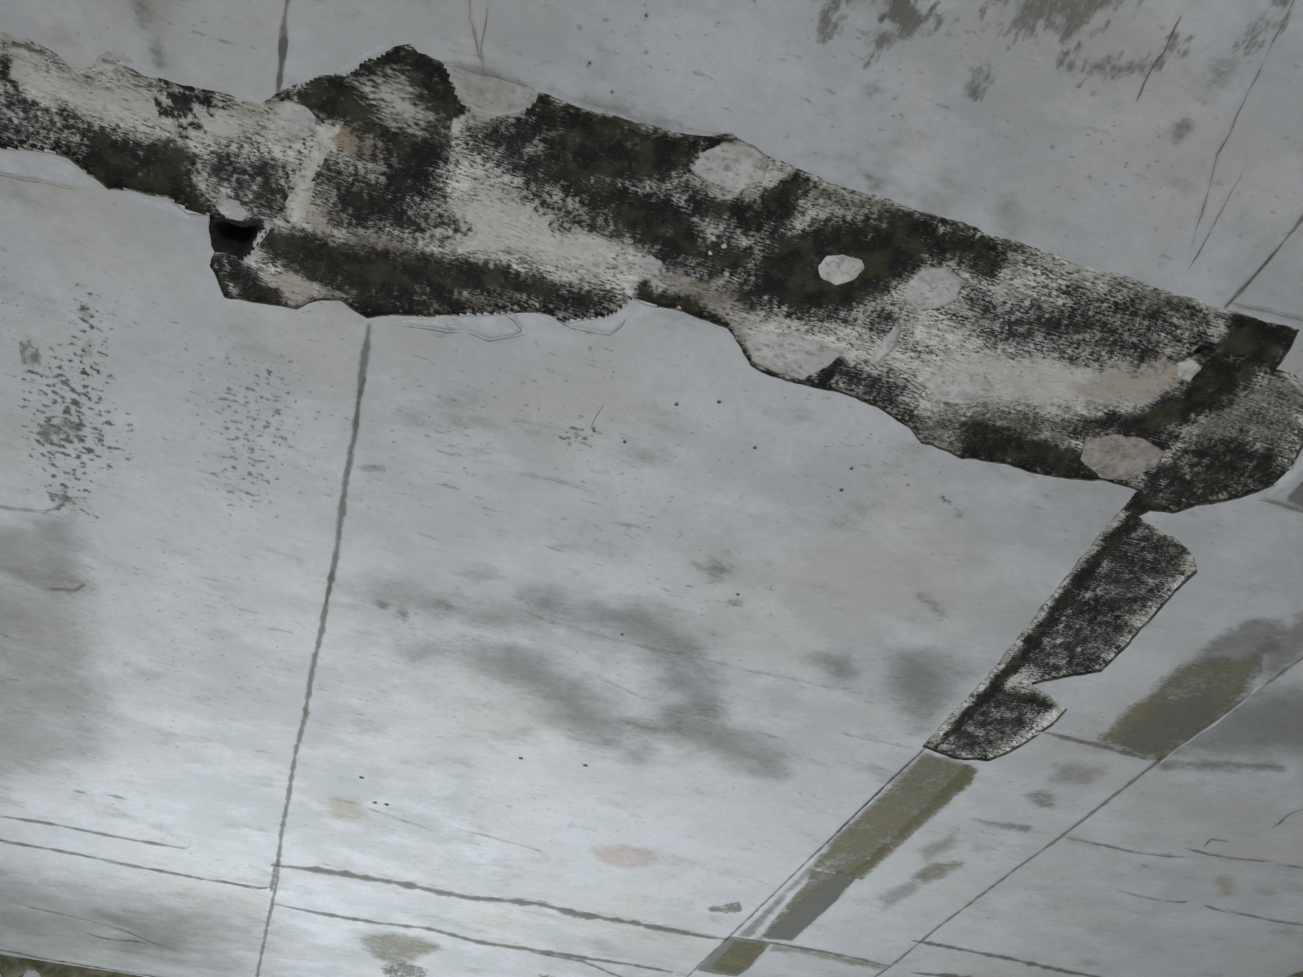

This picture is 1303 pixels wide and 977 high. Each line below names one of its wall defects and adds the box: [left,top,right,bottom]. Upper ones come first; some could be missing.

damp [876,0,940,48]
damp [1021,0,1109,68]
crack [1136,15,1182,102]
crack [1188,0,1294,270]
damp [9,285,133,519]
spalling [0,31,1303,761]
damp [1102,655,1260,759]
damp [698,755,976,976]